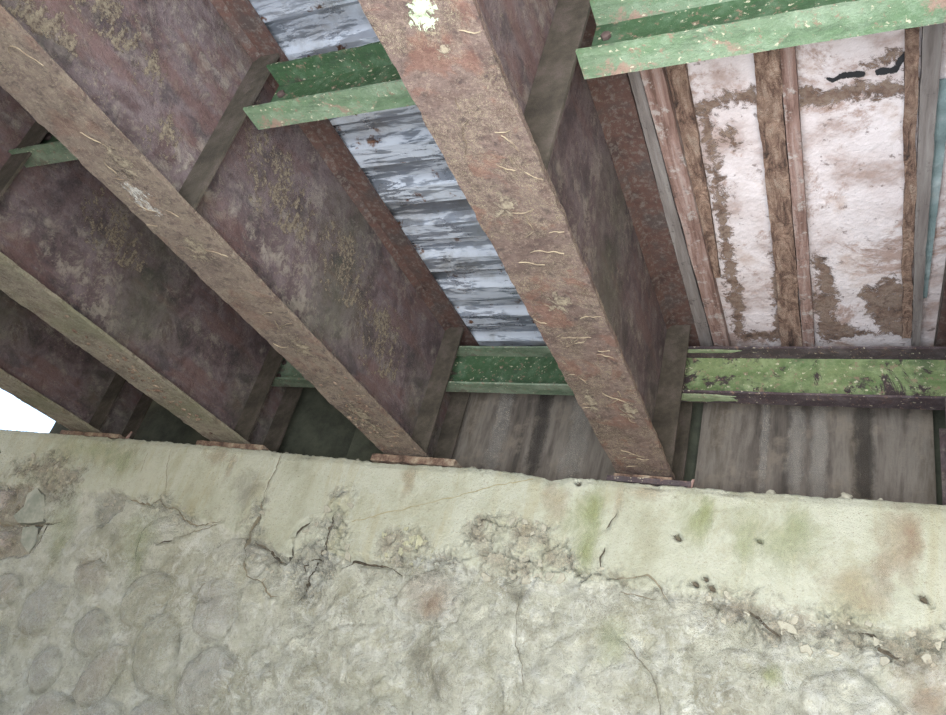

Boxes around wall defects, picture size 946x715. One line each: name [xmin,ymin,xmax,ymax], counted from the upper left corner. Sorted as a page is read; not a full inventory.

spalling [0,486,44,558]
crack [243,456,334,600]
crack [347,560,402,576]
flaking render [471,516,587,584]
crack [599,512,668,601]
flaking render [693,577,760,625]
crack [747,610,780,637]
flaking render [769,616,851,657]
crack [859,633,899,659]
flaking render [864,619,904,667]
flaking render [920,638,945,668]